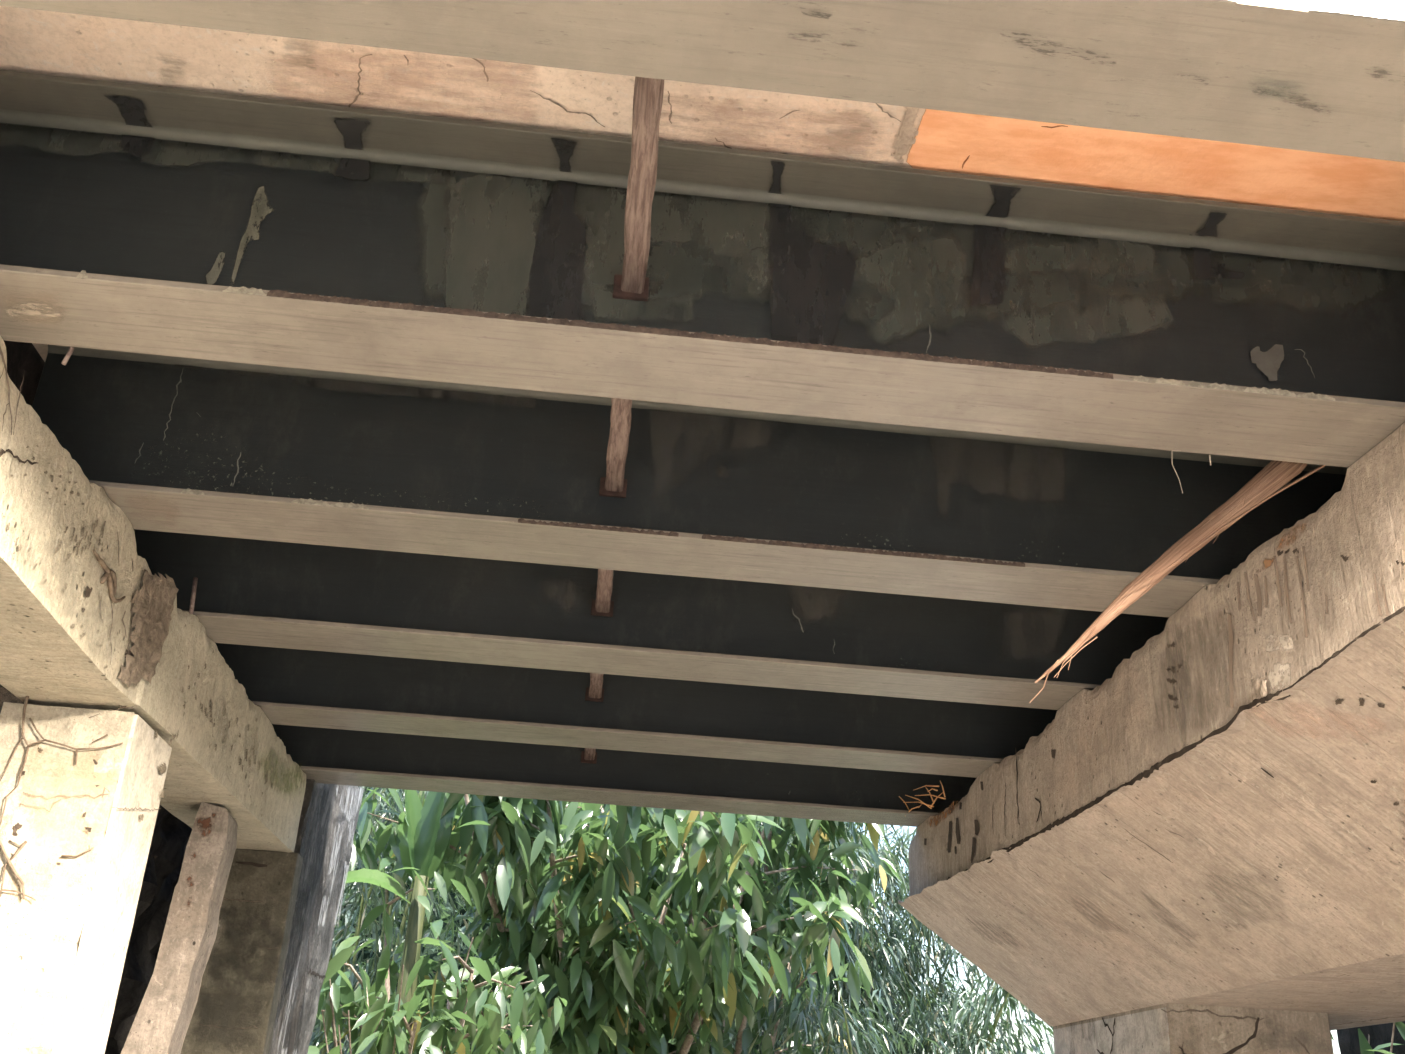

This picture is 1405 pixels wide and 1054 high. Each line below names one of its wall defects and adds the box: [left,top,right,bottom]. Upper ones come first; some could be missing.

crack [349,54,409,107]
crack [530,90,605,127]
peeling [205,186,274,296]
peeling [1132,344,1335,401]
spalling [11,445,84,505]
spalling [54,520,106,563]
spalling [71,586,103,646]
spalling [104,569,179,688]
crack [947,606,1405,880]
crack [19,787,161,812]
crack [1161,1009,1264,1054]